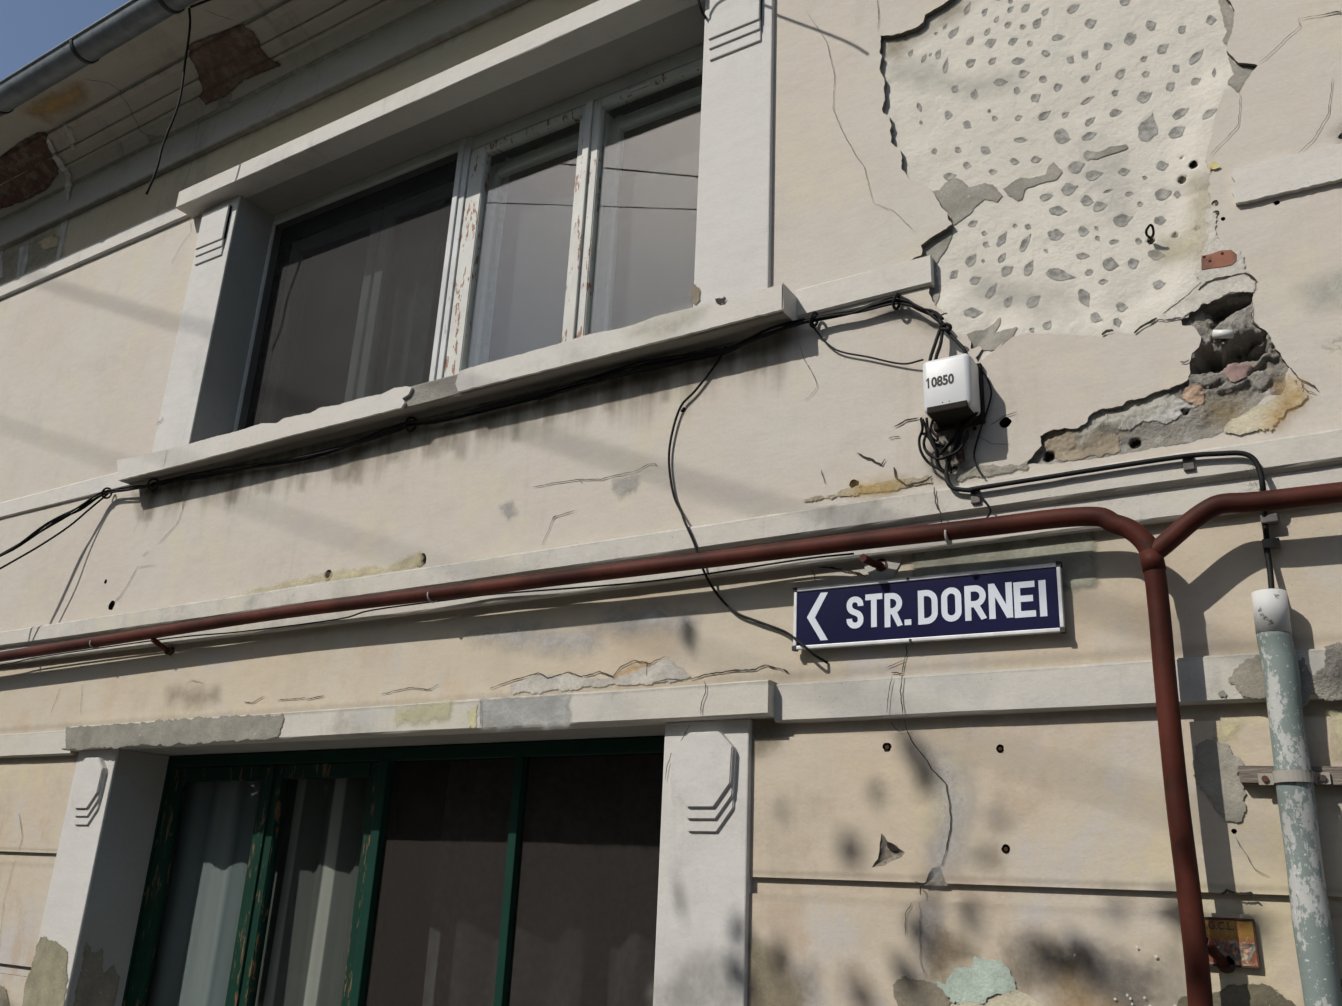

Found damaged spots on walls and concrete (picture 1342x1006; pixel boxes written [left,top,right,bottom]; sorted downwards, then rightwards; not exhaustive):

crack [1260,11,1342,62]
crack [809,16,911,228]
crack [1299,78,1333,153]
spalling [882,0,1310,481]
peeling [65,713,284,750]
peeling [1193,724,1246,823]
crack [886,646,952,973]
peeling [0,936,120,1006]
leakage [921,910,967,971]
peeling [893,956,1044,1006]
leakage [1057,958,1148,1006]
peeling [1212,983,1296,1006]